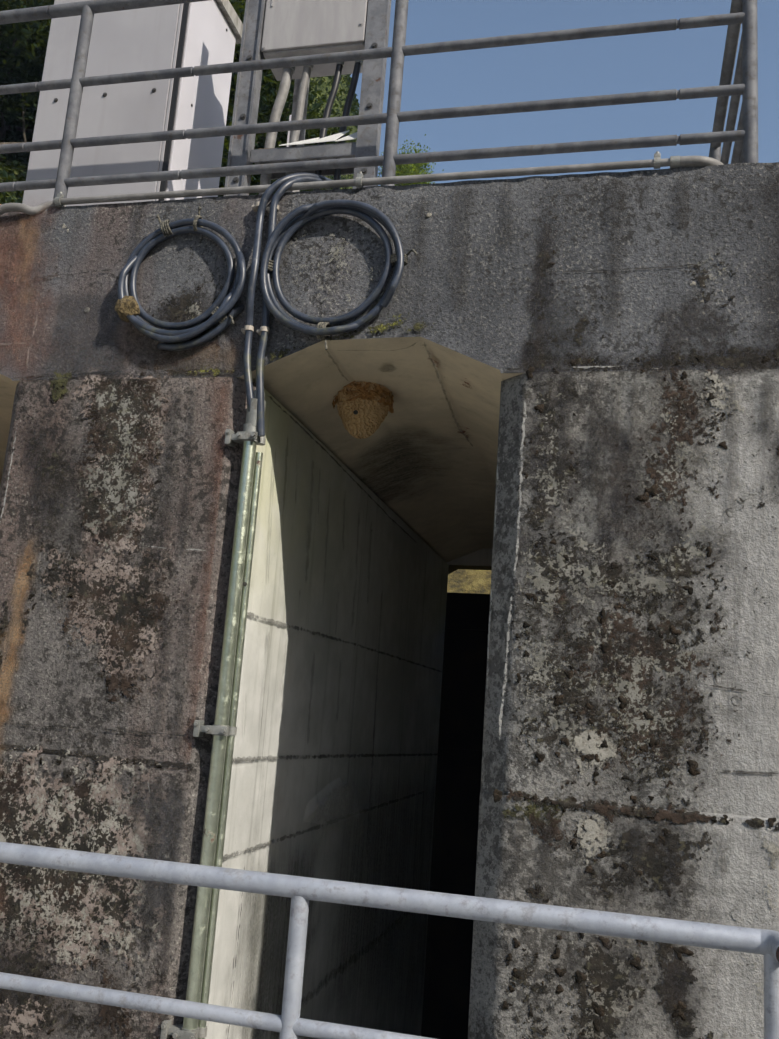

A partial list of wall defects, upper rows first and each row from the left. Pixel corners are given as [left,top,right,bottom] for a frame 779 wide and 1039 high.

leakage [520,214,618,366]
leakage [591,358,752,557]
rust [0,547,31,721]
peeling [493,664,673,875]